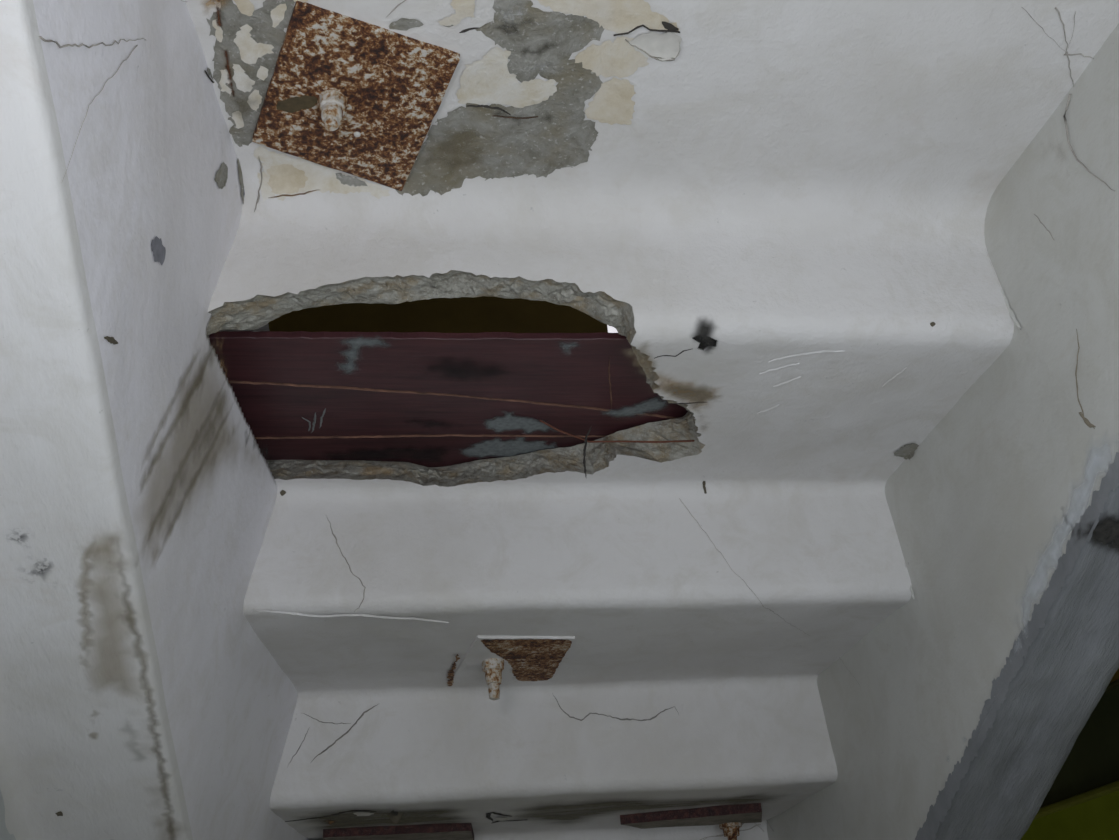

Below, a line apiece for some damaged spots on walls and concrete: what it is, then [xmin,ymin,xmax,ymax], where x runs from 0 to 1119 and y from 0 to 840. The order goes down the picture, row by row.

corrosion [206,0,224,26]
corrosion [224,51,234,96]
peeling [204,0,682,212]
spalling [206,270,711,496]
crack [288,705,377,765]
crack [552,693,679,721]